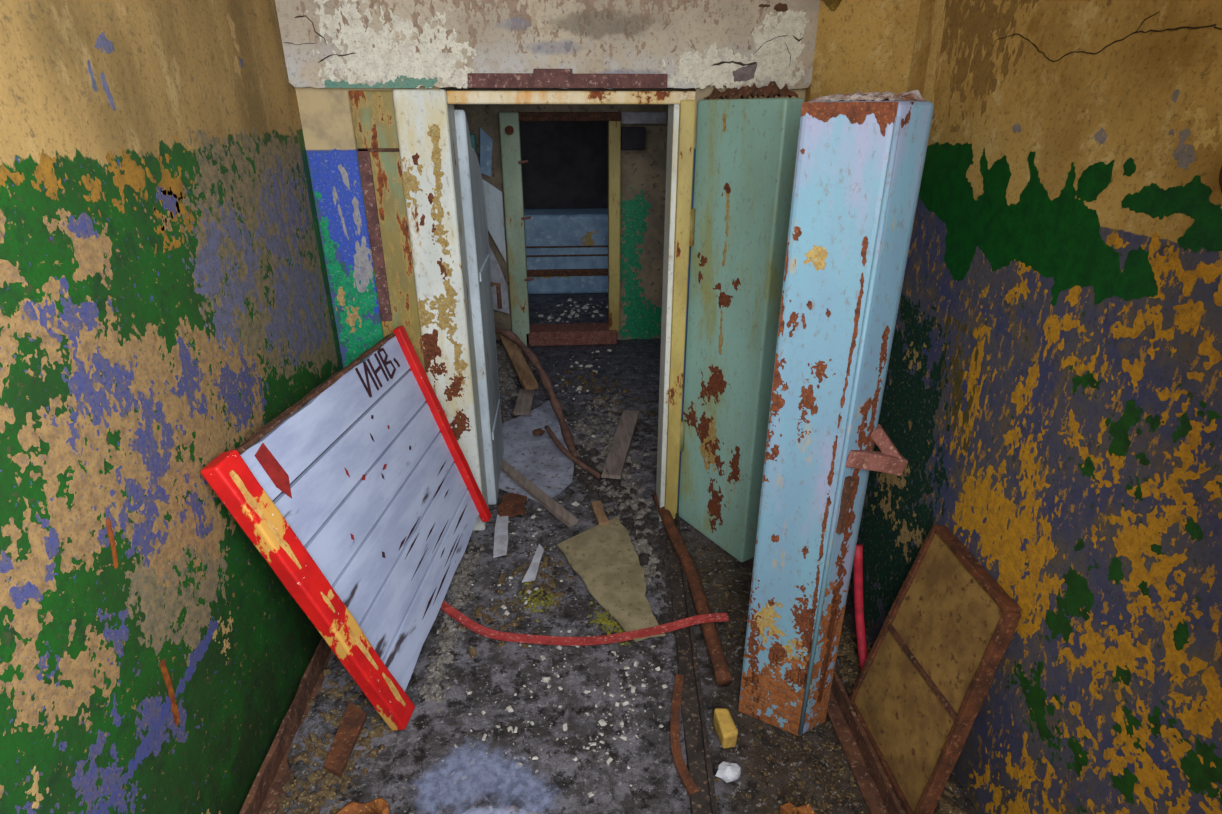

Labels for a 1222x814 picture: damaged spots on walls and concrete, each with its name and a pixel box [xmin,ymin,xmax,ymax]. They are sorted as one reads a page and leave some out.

spalling [296,0,810,89]
spalling [822,0,842,11]
crack [997,11,1222,62]
rust [401,124,471,440]
peeling [0,126,384,736]
peeling [847,0,1222,814]
peeling [25,766,49,809]